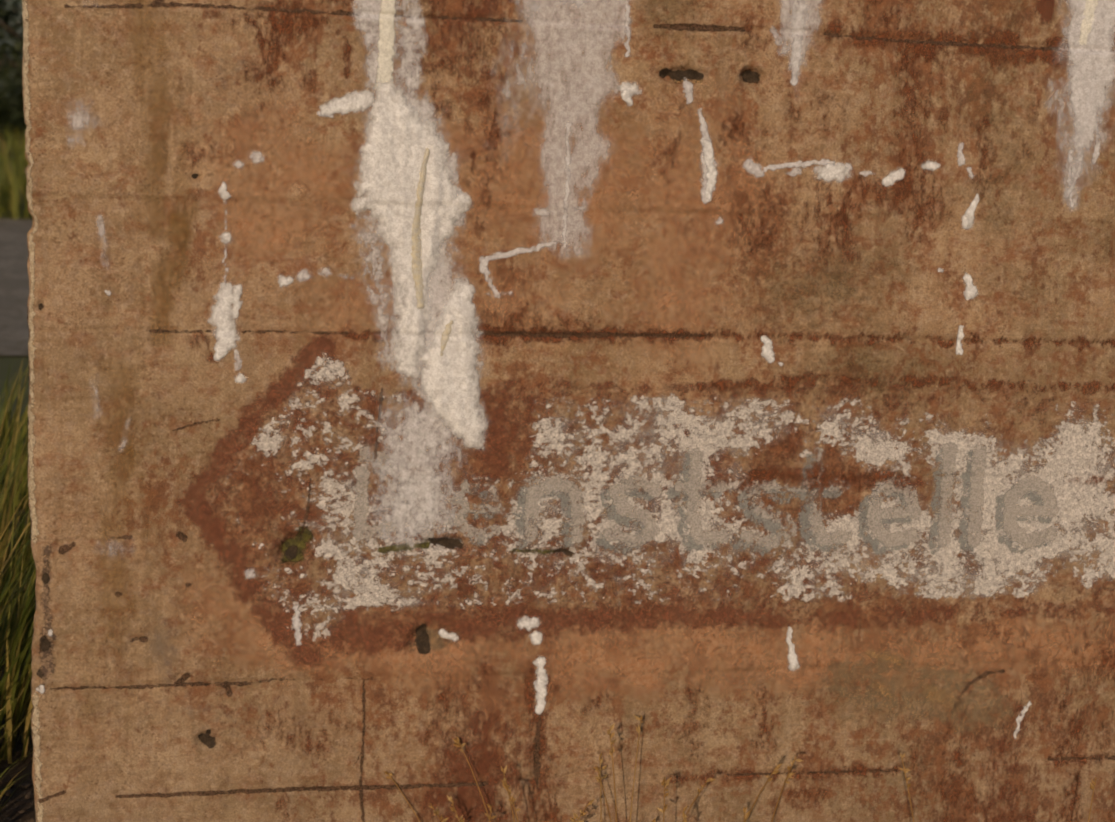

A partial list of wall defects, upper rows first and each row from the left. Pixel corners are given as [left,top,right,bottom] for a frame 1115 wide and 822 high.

damp [480,0,640,297]
spalling [659,68,704,83]
damp [1049,0,1115,207]
damp [317,0,487,546]
spalling [378,537,463,554]
spalling [511,548,573,556]
crack [38,790,66,803]
crack [53,678,284,690]
crack [115,677,488,822]
spalling [415,624,459,654]
damp [518,617,547,714]
corrosion [249,613,1115,822]